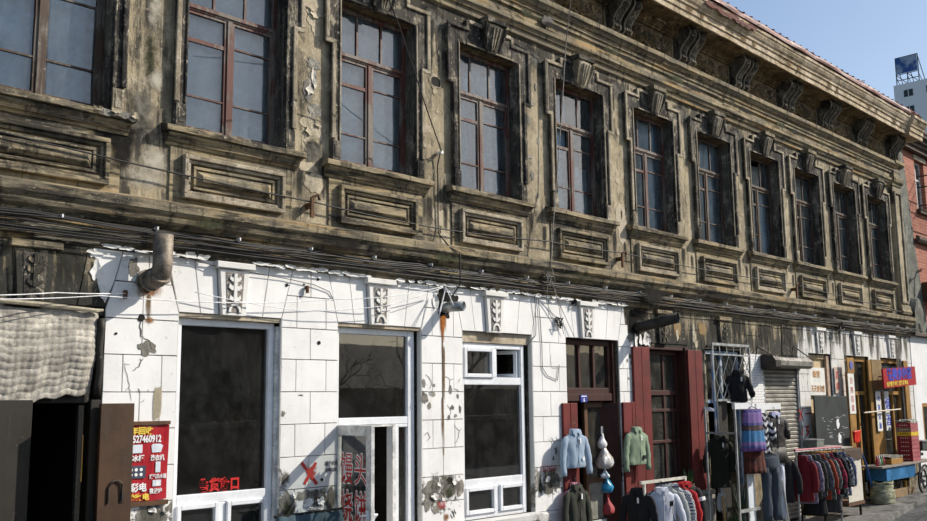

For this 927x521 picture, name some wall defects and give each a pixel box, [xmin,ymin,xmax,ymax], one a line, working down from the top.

damp [149,0,162,23]
damp [91,39,164,187]
spalling [298,57,325,194]
peeling [22,221,153,300]
peeling [173,251,210,261]
corrosion [139,290,158,323]
damp [693,318,719,336]
spalling [137,340,156,357]
damp [824,329,880,365]
damp [895,337,908,368]
peeling [279,473,337,515]
peeling [422,477,464,514]